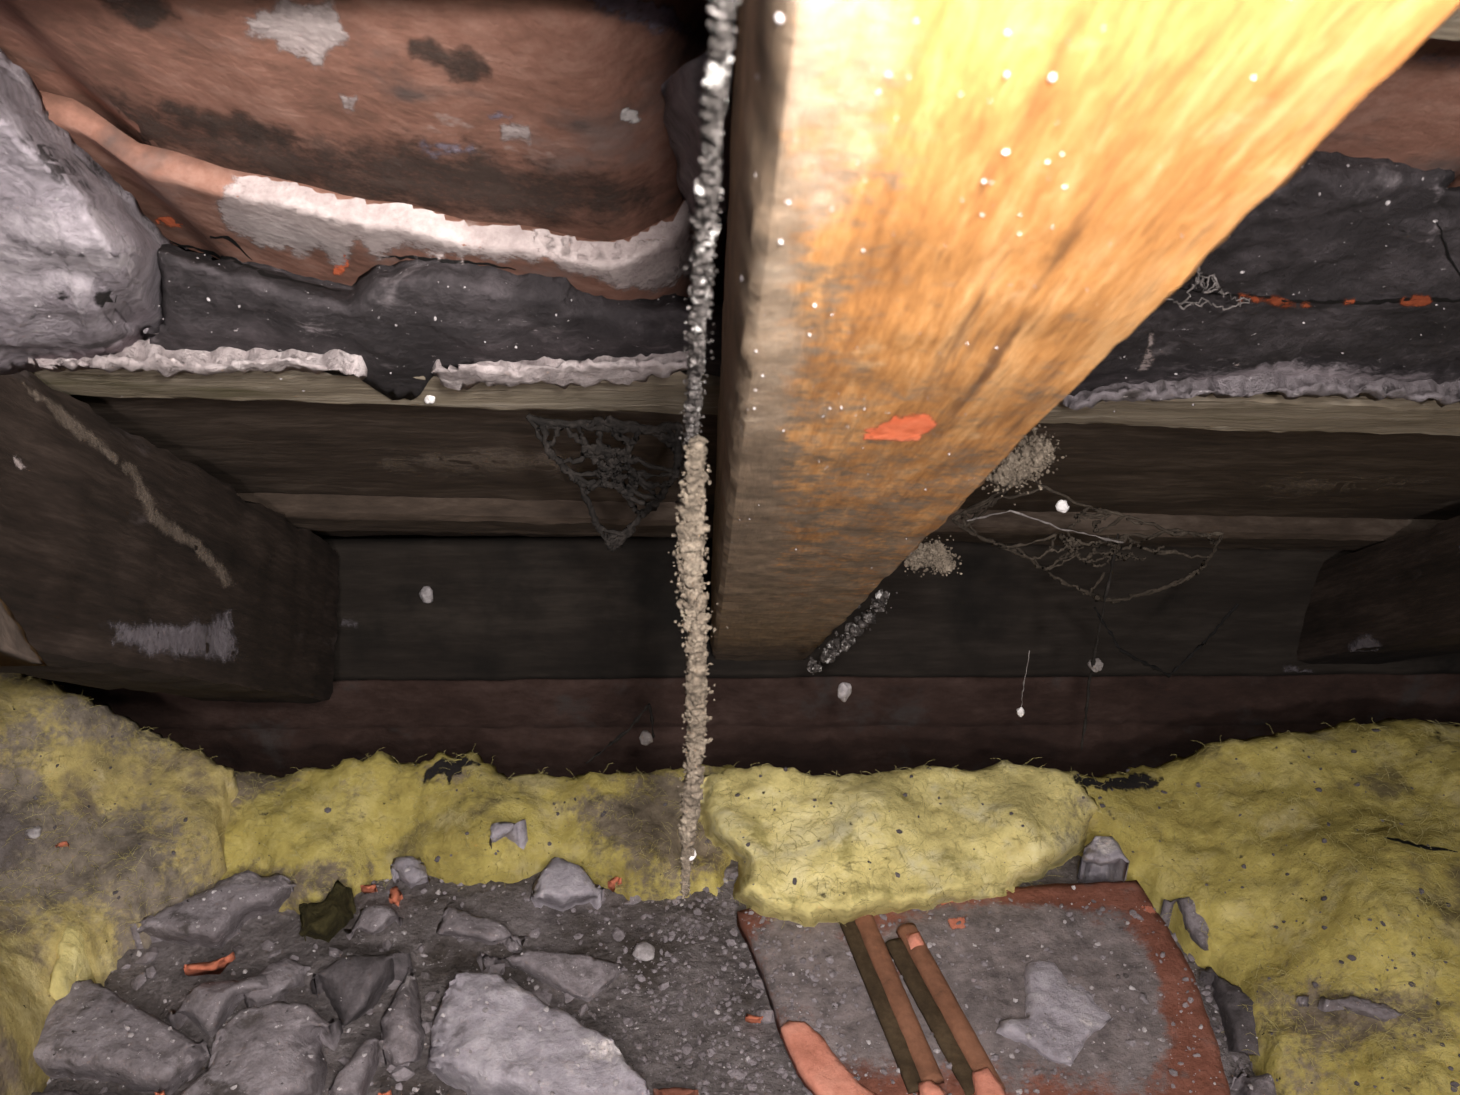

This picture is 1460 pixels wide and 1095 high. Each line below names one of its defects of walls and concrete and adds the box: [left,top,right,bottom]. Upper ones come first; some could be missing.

crack [1178,220,1460,305]